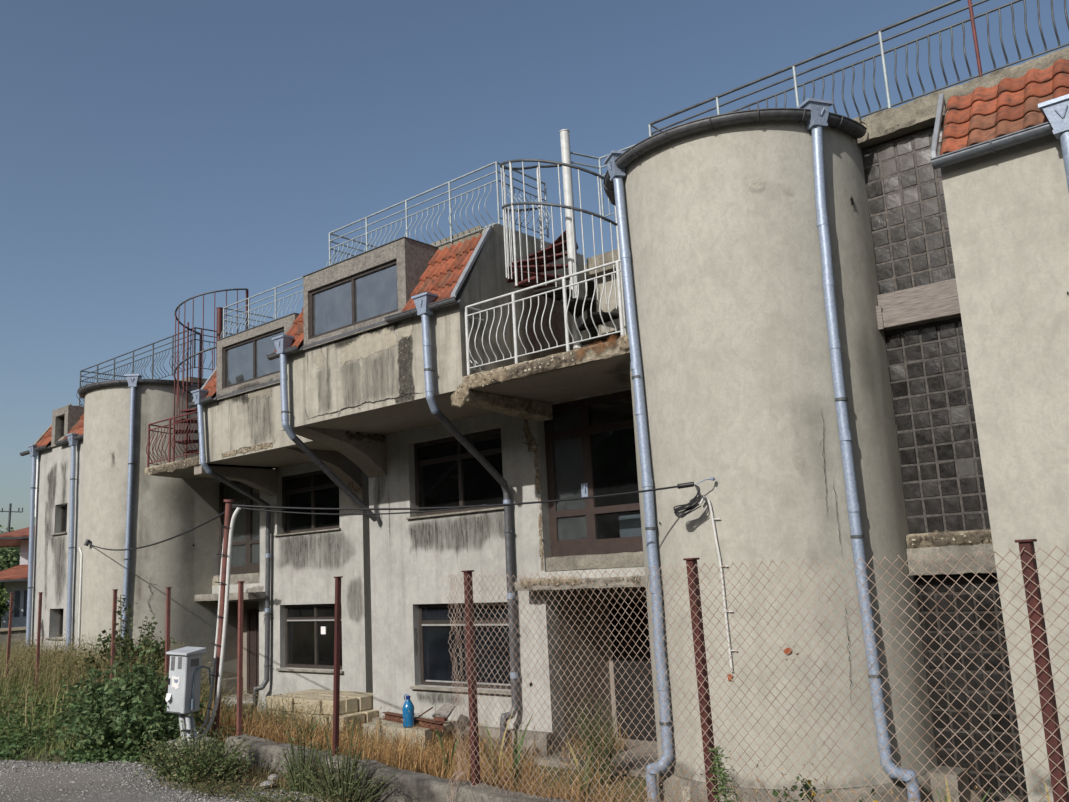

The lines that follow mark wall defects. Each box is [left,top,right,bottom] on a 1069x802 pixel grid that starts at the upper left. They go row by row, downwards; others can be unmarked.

damp [327,322,414,407]
spalling [451,351,575,407]
damp [413,522,443,548]